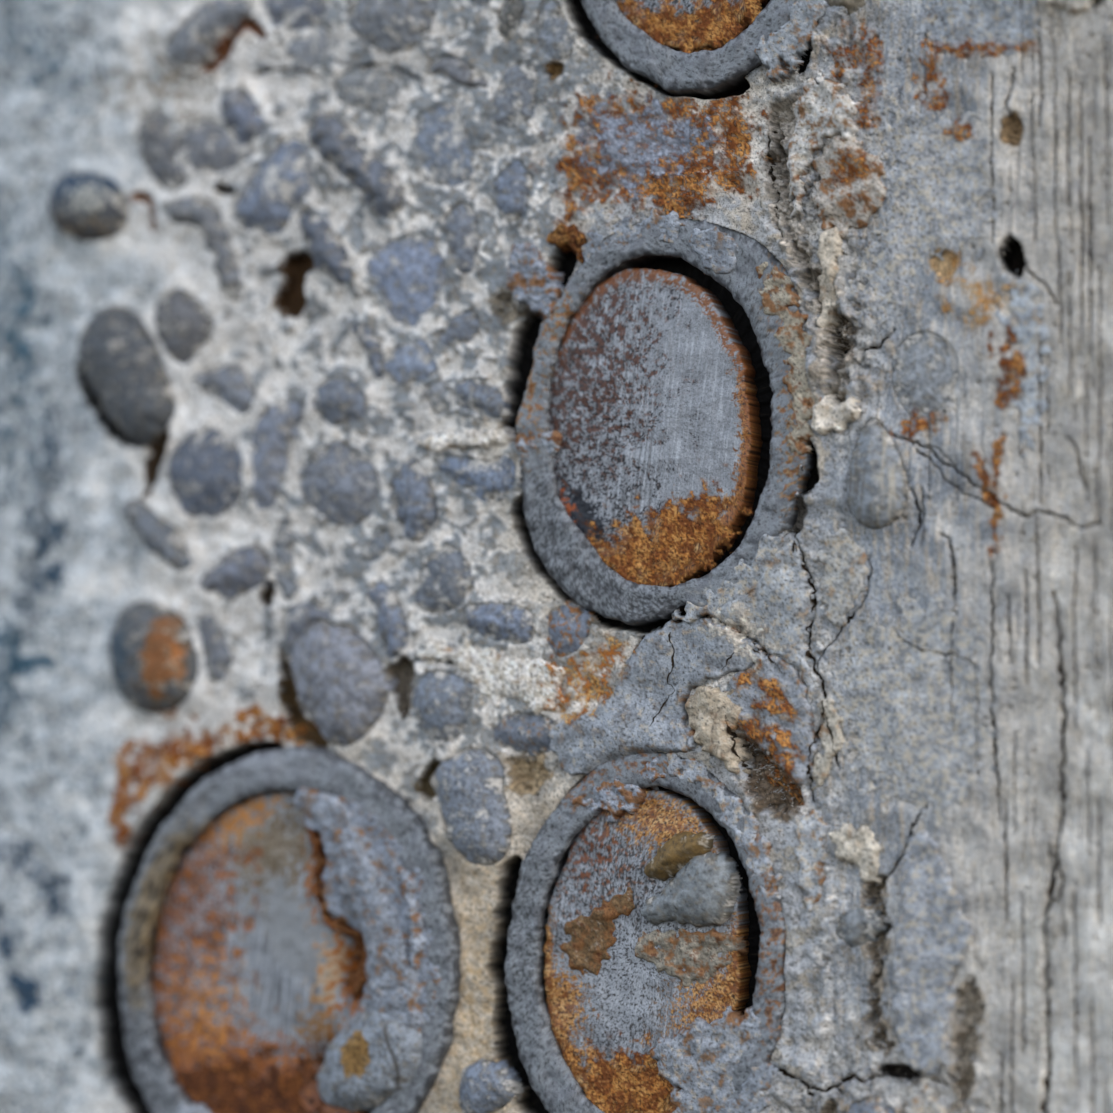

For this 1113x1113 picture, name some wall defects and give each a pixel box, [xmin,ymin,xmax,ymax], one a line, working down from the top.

rust [619,0,761,53]
rust [546,79,773,264]
rust [928,251,1026,409]
rust [587,480,752,586]
rust [970,436,1006,557]
crack [895,0,1113,1113]
rust [108,703,318,849]
rust [306,827,368,999]
rust [560,887,635,975]
rust [727,659,804,806]
crack [889,806,928,876]
crack [777,1068,884,1097]